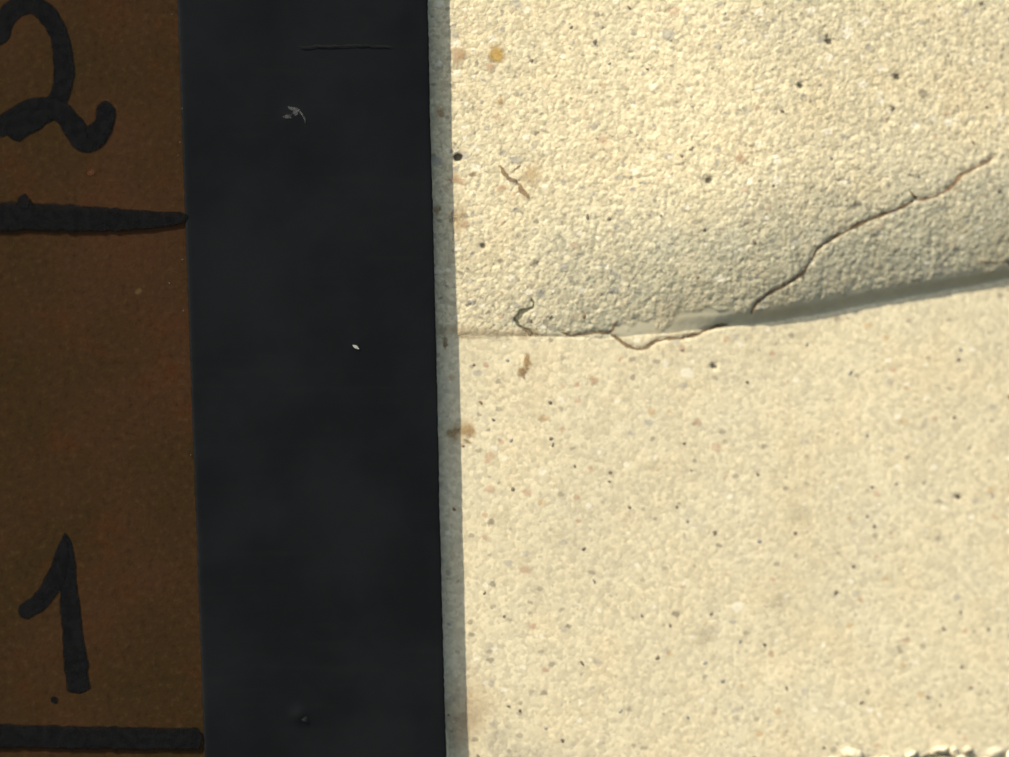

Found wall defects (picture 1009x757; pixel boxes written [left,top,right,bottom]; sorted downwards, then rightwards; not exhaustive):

crack [499,165,529,198]
crack [751,156,993,313]
crack [514,298,534,336]
crack [562,321,729,350]
spalling [818,744,1009,757]